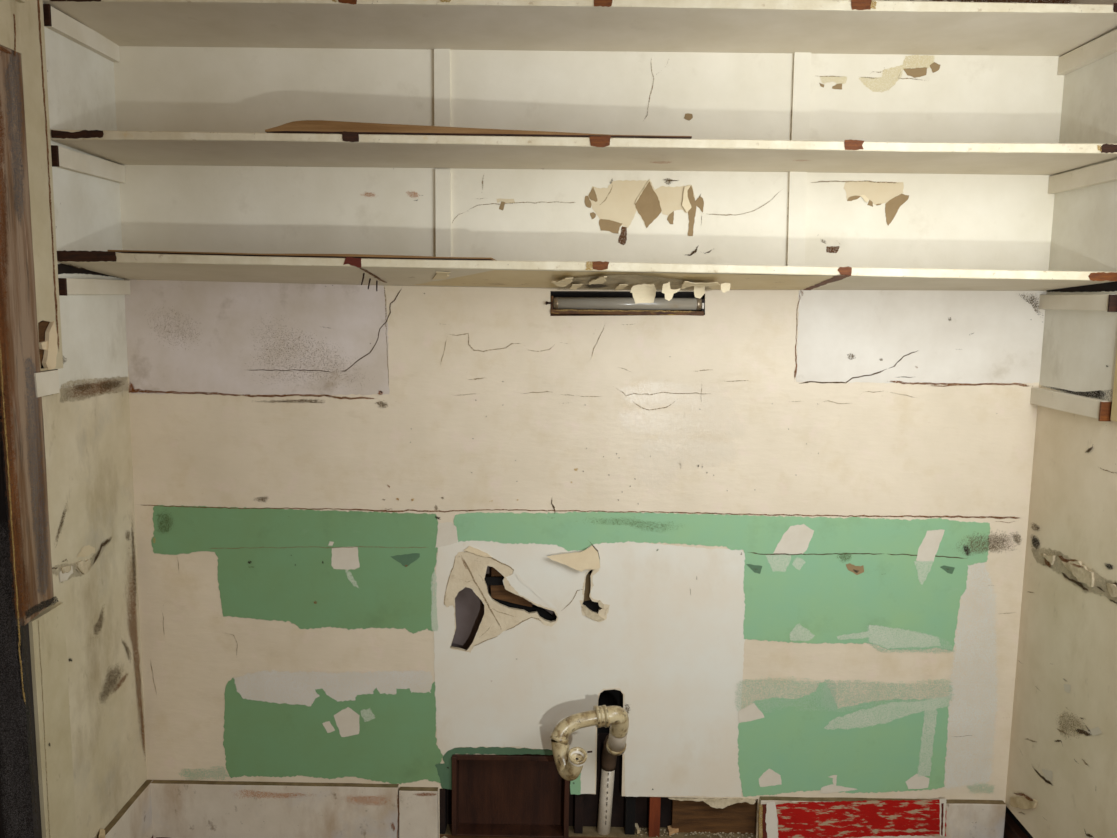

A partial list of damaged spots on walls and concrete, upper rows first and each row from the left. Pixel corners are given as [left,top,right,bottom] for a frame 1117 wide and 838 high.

peeling [819,55,940,92]
peeling [584,178,704,245]
peeling [811,180,909,225]
peeling [551,275,730,304]
crack [129,268,401,400]
crack [792,295,1033,404]
damp [956,522,1040,556]
spalling [846,563,864,575]
spalling [444,540,610,653]
spalling [598,689,623,708]
spalling [569,726,757,838]
spalling [439,788,538,838]